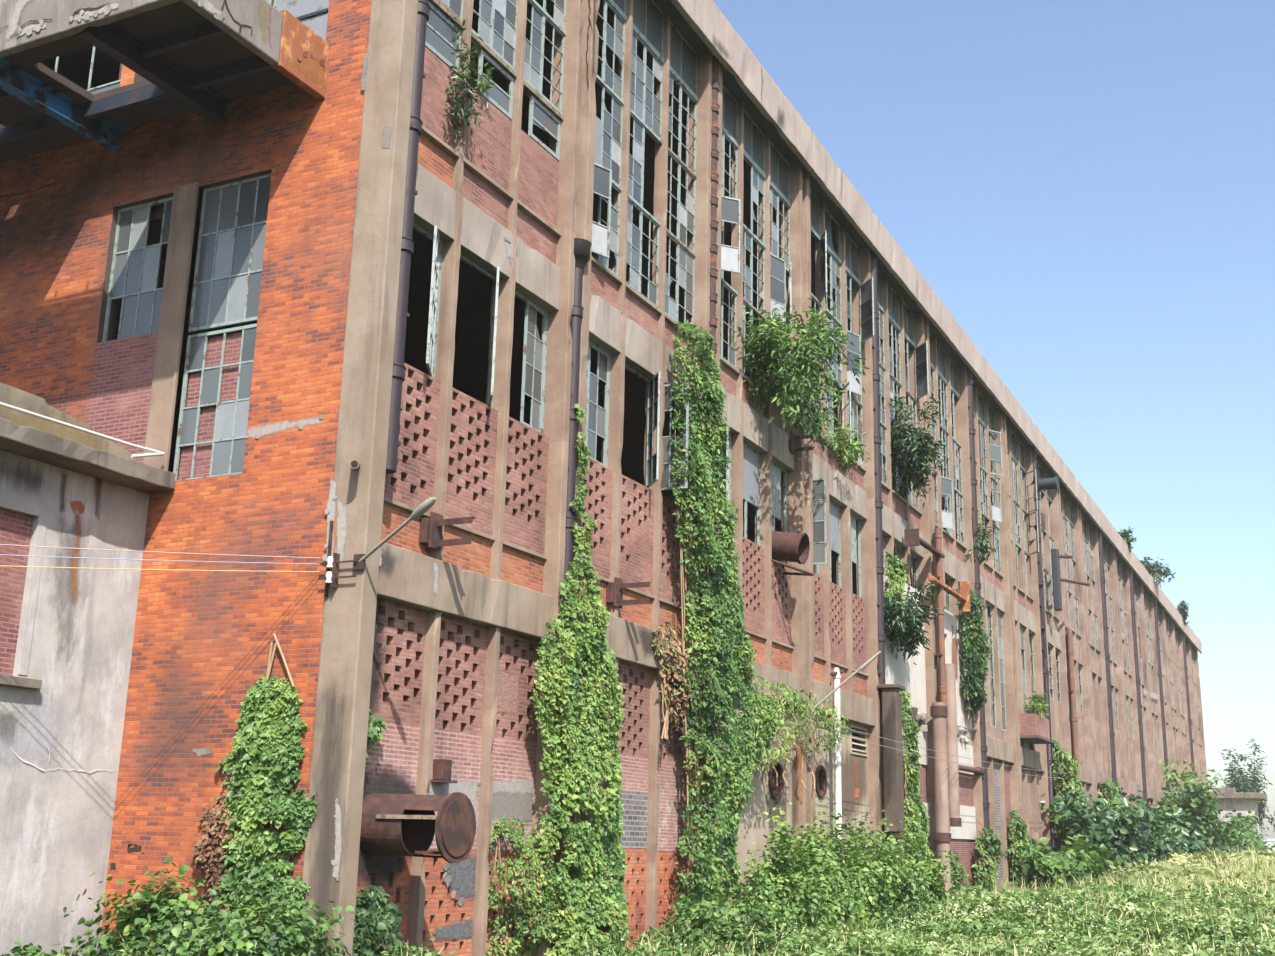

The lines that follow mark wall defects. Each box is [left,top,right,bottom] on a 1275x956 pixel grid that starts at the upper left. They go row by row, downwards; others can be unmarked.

spalling [69,3,119,22]
spalling [198,0,225,21]
spalling [16,19,47,36]
corrosion [72,515,81,594]
spalling [435,856,477,940]